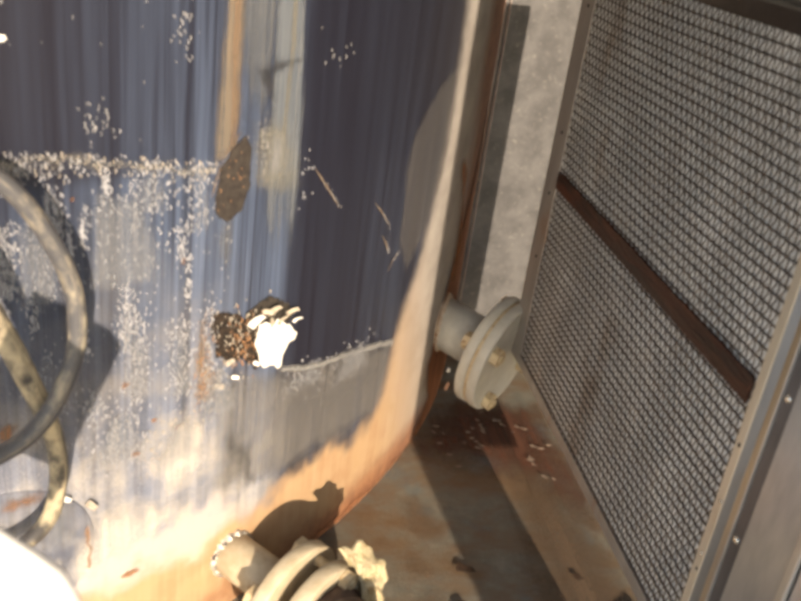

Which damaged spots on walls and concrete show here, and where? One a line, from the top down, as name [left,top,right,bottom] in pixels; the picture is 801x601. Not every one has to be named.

leakage [0,0,393,484]
rust [190,299,262,419]
peeling [245,296,303,368]
rust [409,91,623,601]